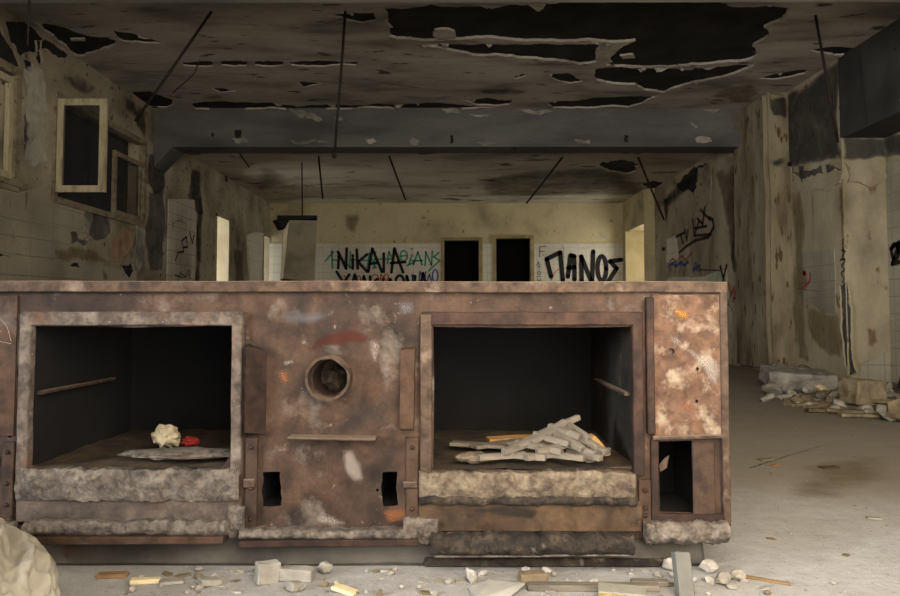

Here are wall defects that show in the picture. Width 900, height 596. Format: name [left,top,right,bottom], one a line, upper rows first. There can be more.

flaking render [0,21,159,71]
flaking render [182,2,787,122]
flaking render [764,70,808,78]
flaking render [128,91,172,106]
flaking render [676,160,707,193]